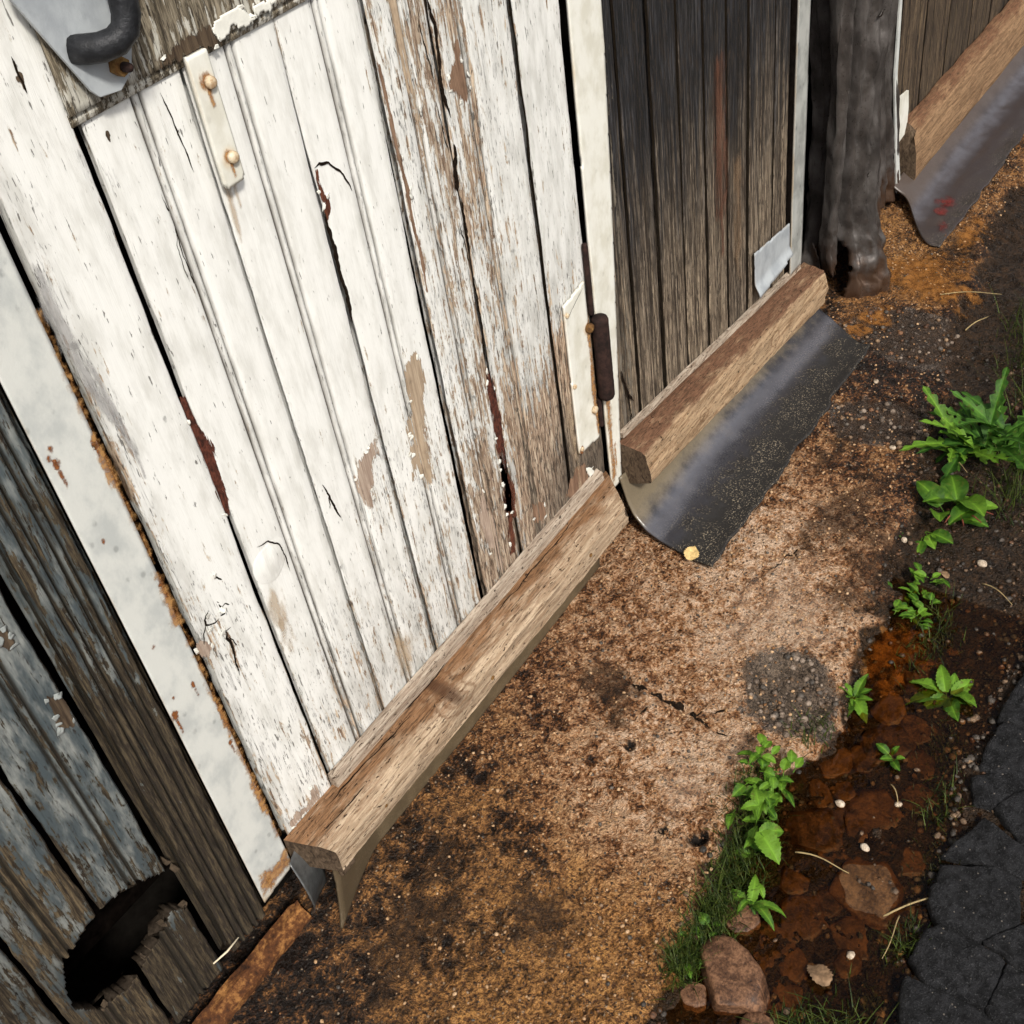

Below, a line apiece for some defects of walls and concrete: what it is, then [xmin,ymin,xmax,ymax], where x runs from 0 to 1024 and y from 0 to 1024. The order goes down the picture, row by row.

corrosion [201,73,216,107]
peeling [447,38,471,105]
crack [315,161,352,190]
crack [325,214,353,322]
peeling [404,352,433,485]
peeling [353,440,380,509]
crack [616,672,729,737]